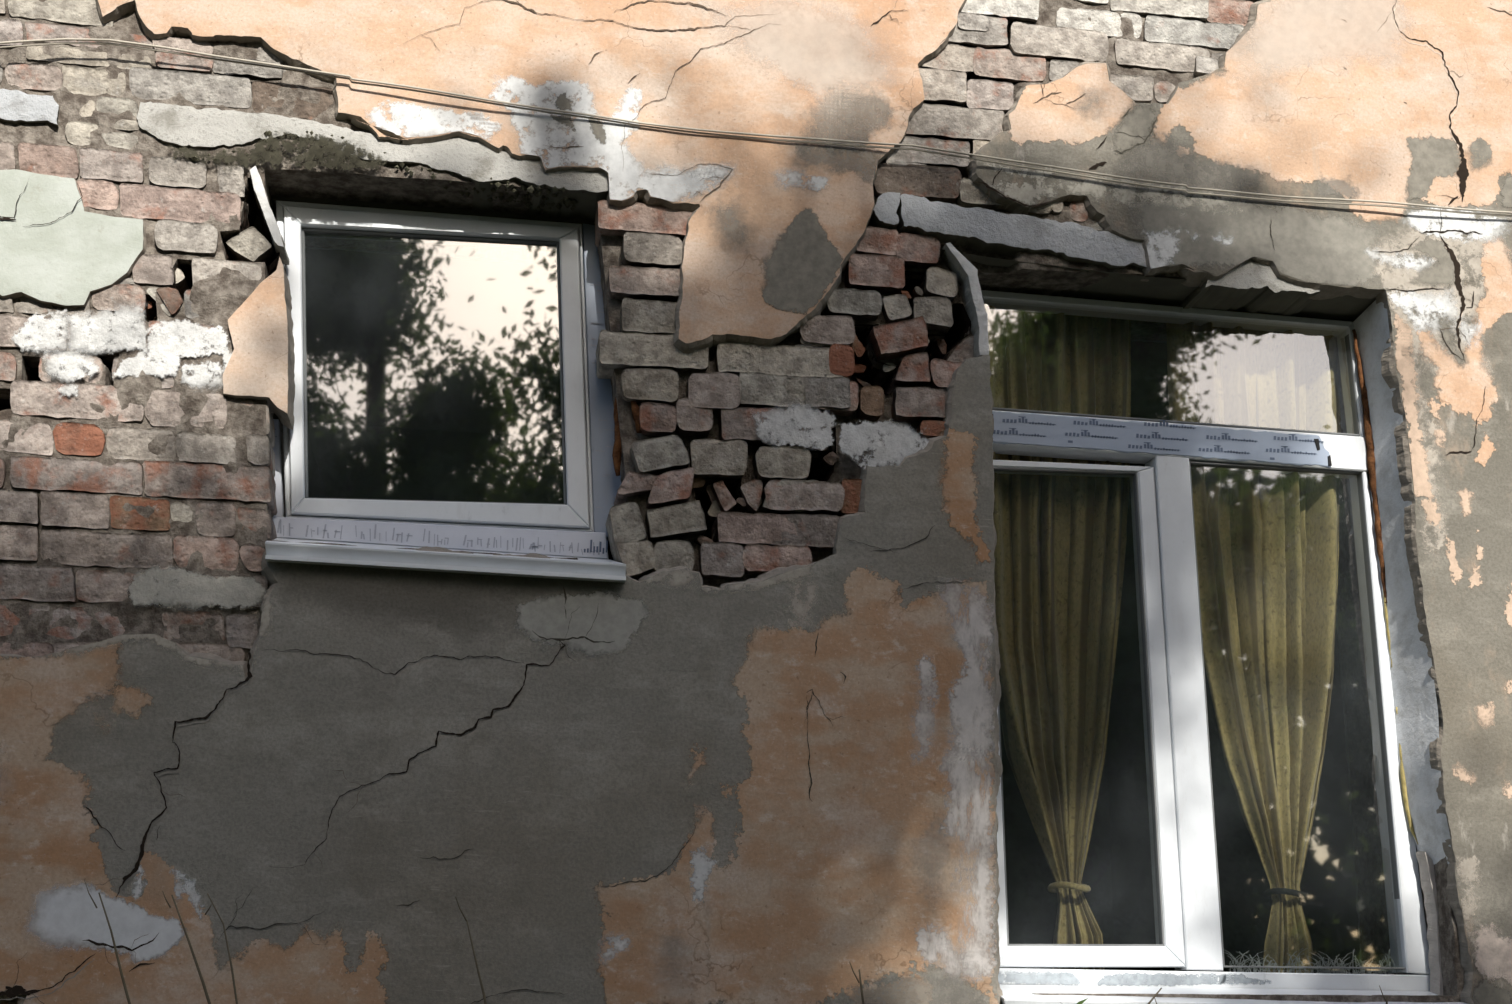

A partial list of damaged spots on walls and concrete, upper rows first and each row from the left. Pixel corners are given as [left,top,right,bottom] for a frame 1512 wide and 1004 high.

crack [407,0,779,202]
crack [871,1,902,26]
peeling [873,0,1512,231]
crack [1342,0,1486,455]
spalling [0,0,389,1004]
peeling [372,151,999,1004]
peeling [1392,238,1512,588]
crack [85,586,614,945]
crack [471,989,562,1004]
crack [602,824,697,887]
spalling [1462,901,1512,986]
peeling [1477,680,1512,726]